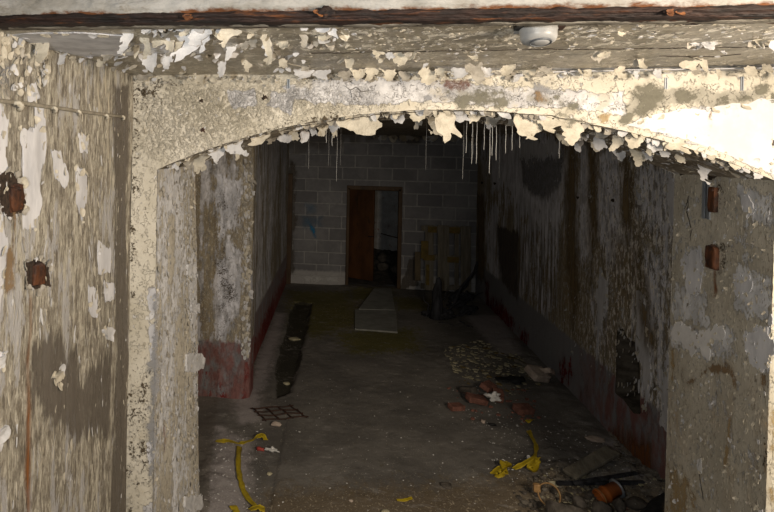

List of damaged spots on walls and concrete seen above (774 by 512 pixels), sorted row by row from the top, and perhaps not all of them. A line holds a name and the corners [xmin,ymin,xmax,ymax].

water stain [30,79,183,512]
water stain [497,224,518,300]
water stain [521,145,578,315]
water stain [588,150,597,227]
peeling [615,191,774,512]
peeling [52,425,118,512]